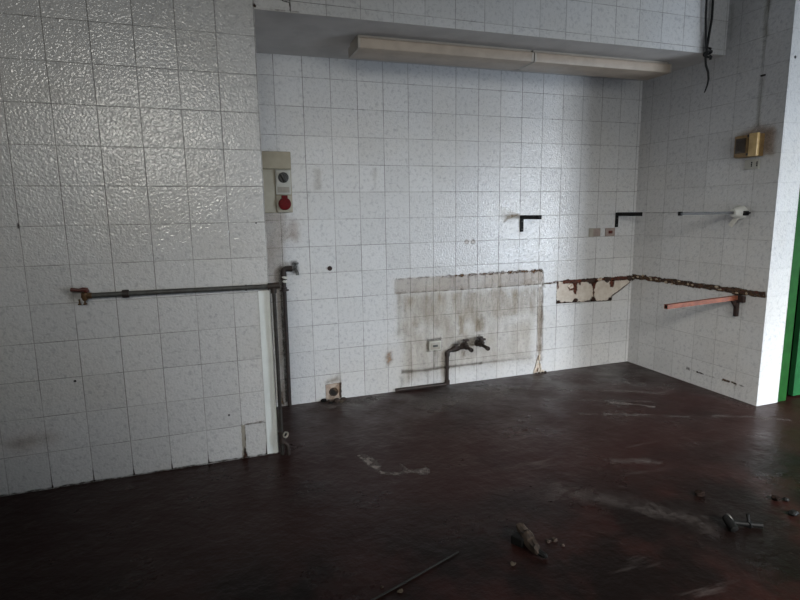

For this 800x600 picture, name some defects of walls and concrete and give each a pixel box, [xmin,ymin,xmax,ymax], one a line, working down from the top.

spalling [556,280,629,304]